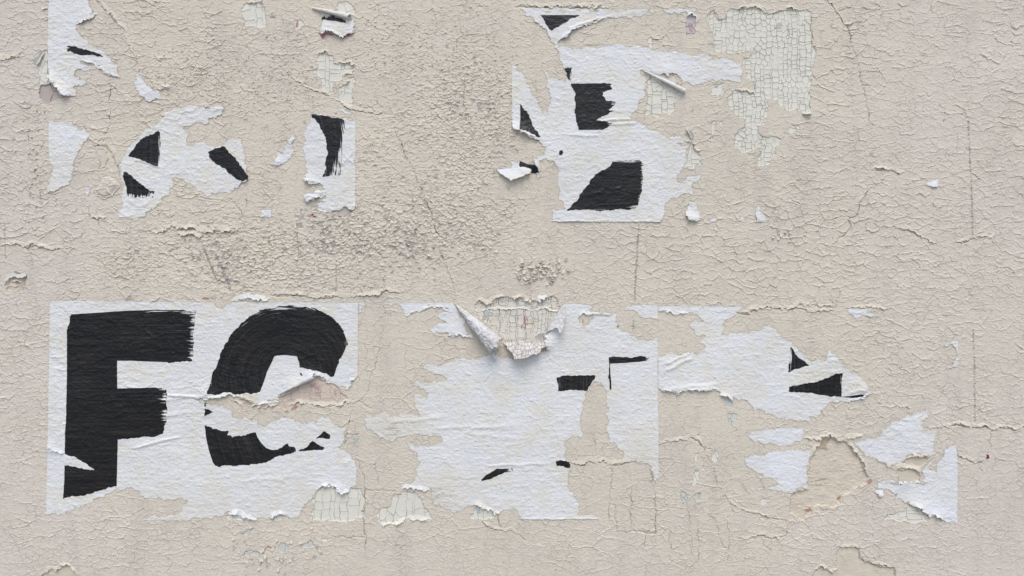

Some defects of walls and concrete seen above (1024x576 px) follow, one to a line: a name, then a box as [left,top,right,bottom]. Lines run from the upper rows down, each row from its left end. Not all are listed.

crack [516,1,609,9]
peeling [644,76,684,118]
peeling [685,4,817,168]
flaking render [138,0,524,299]
crack [148,198,263,238]
crack [231,278,406,301]
peeling [474,257,571,343]
crack [738,299,892,315]
crack [238,338,386,551]
crack [925,420,1024,471]
peeling [225,486,432,576]
crack [572,433,787,565]